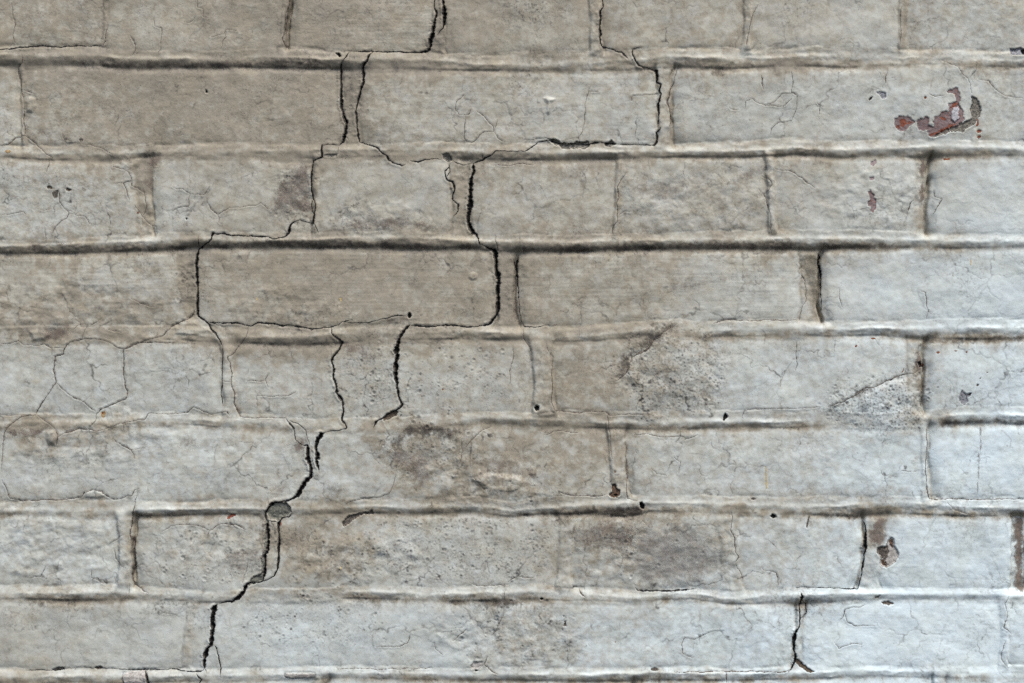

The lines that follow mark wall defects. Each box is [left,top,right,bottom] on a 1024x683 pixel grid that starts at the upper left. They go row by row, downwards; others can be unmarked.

peeling [894,87,981,138]
crack [0,0,698,683]
crack [679,512,873,680]
spalling [877,537,899,568]